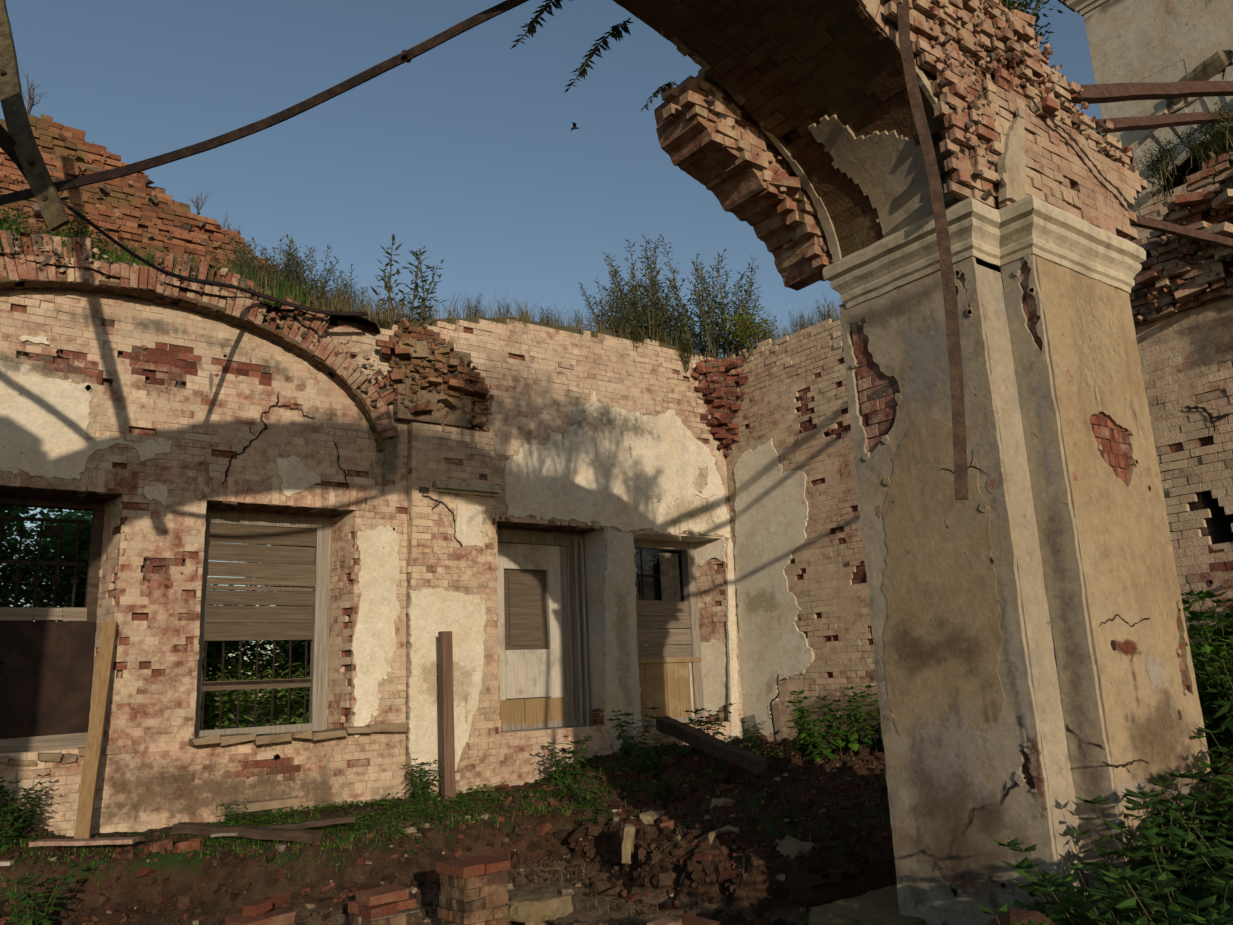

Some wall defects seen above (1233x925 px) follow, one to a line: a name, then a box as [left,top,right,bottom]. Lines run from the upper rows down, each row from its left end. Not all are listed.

peeling [762,127,842,263]
peeling [808,114,946,238]
spalling [1012,253,1042,349]
peeling [0,335,172,480]
crack [222,393,314,485]
spalling [1090,413,1138,487]
peeling [504,390,814,753]
peeling [798,317,1005,736]
peeling [350,525,486,784]
crack [962,775,1035,836]
spalling [1014,714,1037,793]
crack [1066,724,1149,773]